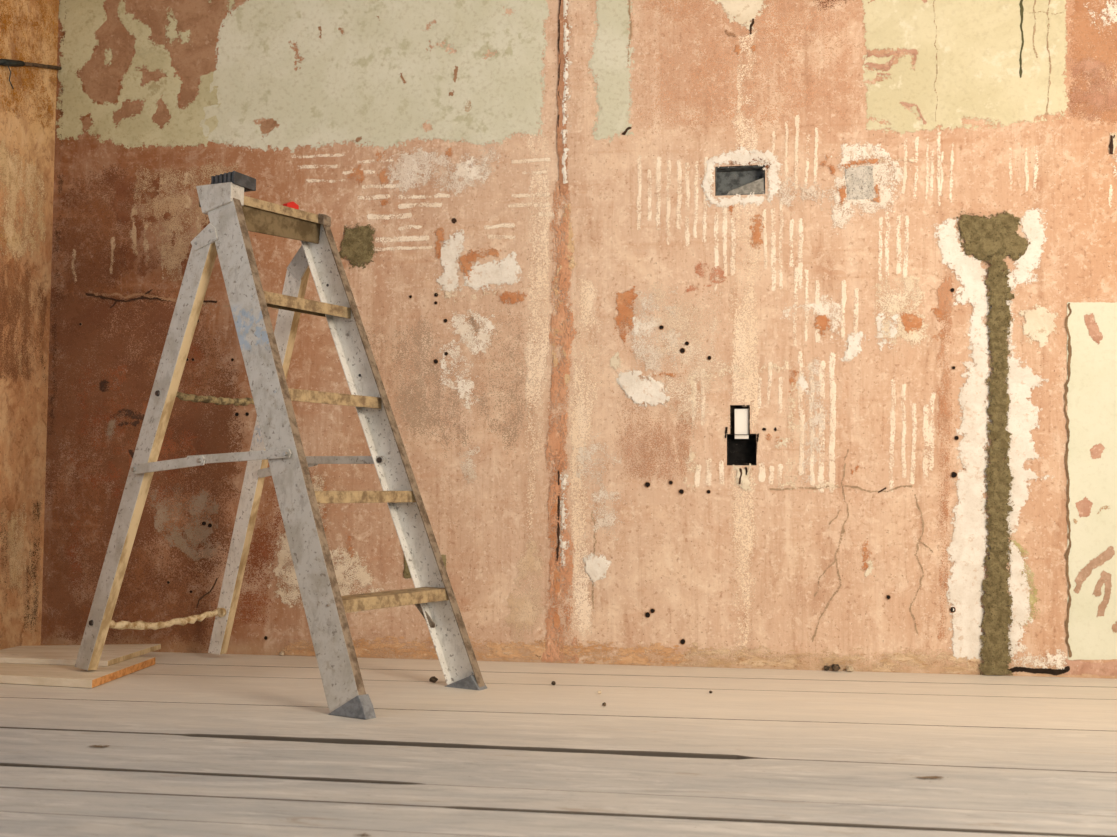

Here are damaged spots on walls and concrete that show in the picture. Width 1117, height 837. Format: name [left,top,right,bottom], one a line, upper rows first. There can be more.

peeling [56,0,550,157]
crack [47,6,230,435]
peeling [433,218,457,259]
crack [769,449,933,642]
peeling [1064,302,1117,677]